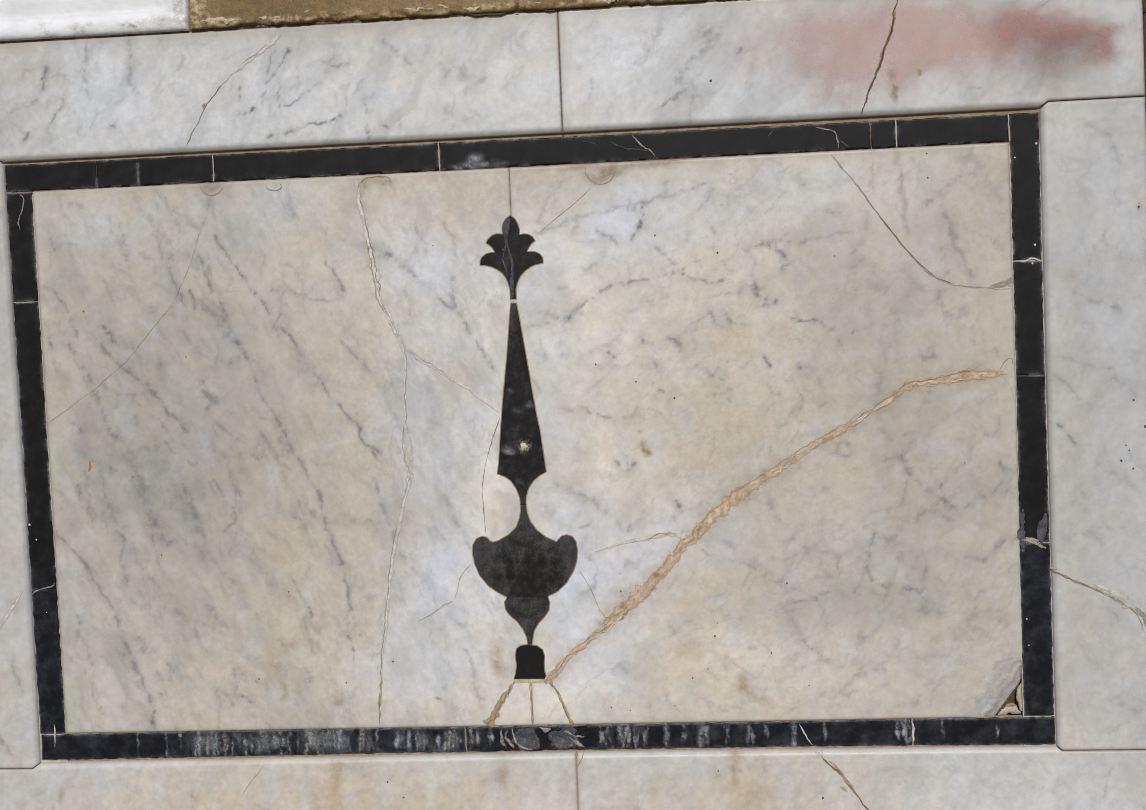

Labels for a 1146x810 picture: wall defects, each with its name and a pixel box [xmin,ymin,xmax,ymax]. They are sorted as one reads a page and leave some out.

crack [861,0,898,113]
crack [817,127,1041,290]
crack [355,179,499,724]
crack [483,358,1009,727]
crack [1051,566,1146,626]
spalling [971,645,1029,717]
crack [800,725,869,810]